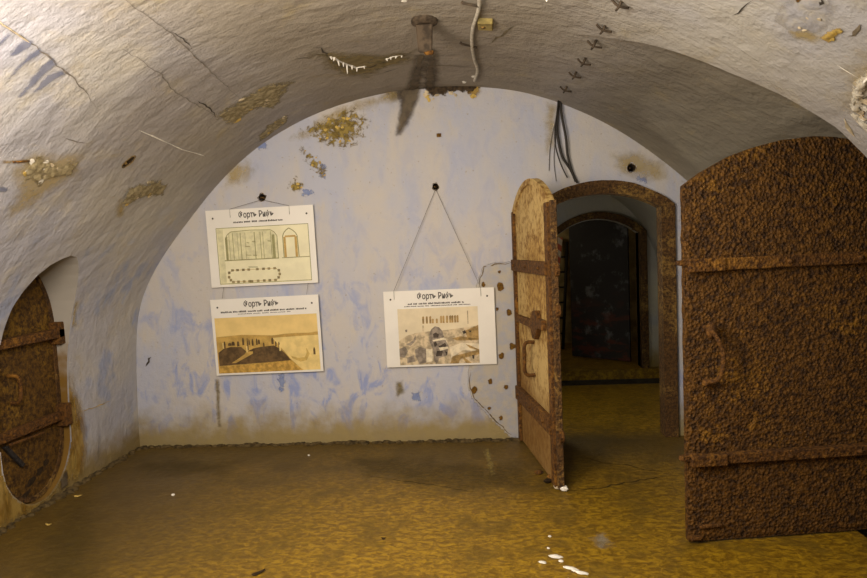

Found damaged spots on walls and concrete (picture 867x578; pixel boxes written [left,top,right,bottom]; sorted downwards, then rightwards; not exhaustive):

crack [0,22,96,107]
crack [125,50,212,114]
crack [126,0,236,95]
peeling [199,82,294,123]
water stain [307,108,365,147]
water stain [383,50,437,133]
spalling [21,156,78,206]
peeling [119,180,168,214]